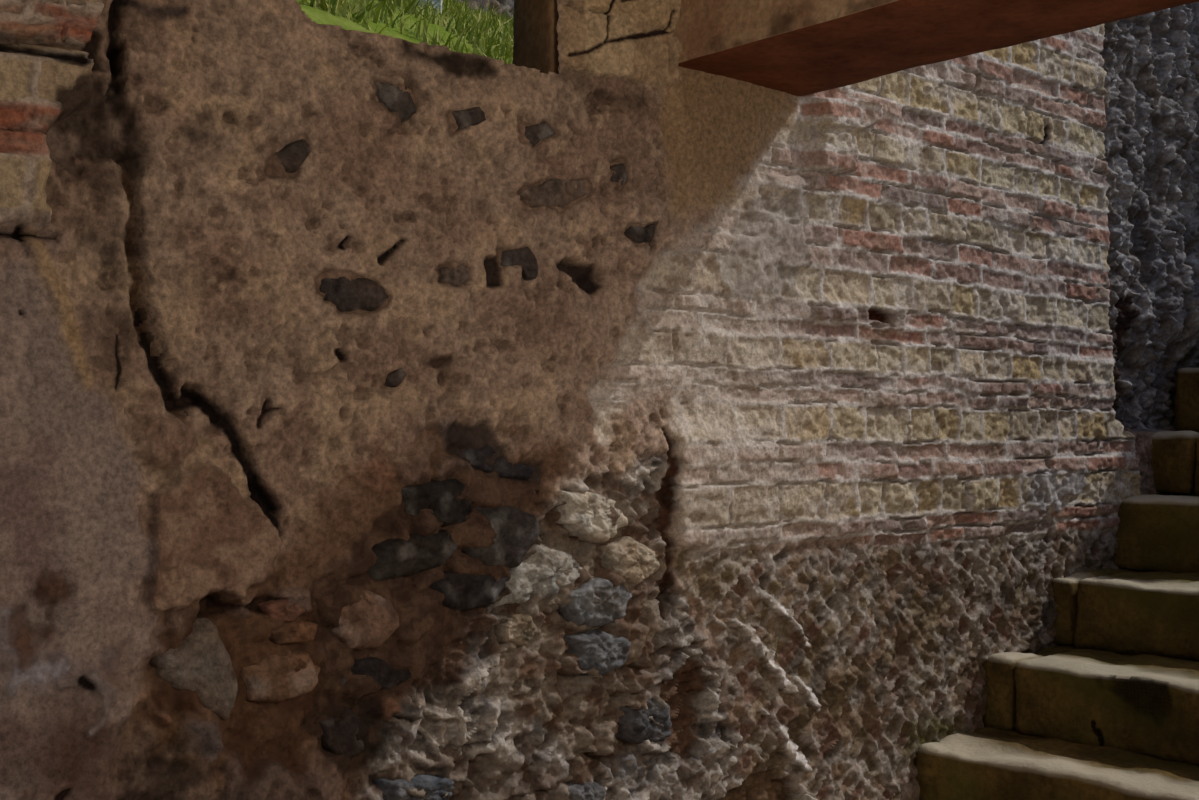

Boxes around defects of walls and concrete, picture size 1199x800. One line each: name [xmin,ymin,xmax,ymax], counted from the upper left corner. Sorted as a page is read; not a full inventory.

crack [0,0,120,101]
crack [568,0,675,56]
crack [115,308,279,531]
flaking render [1027,468,1088,513]
spalling [150,423,706,800]
spalling [721,765,818,800]